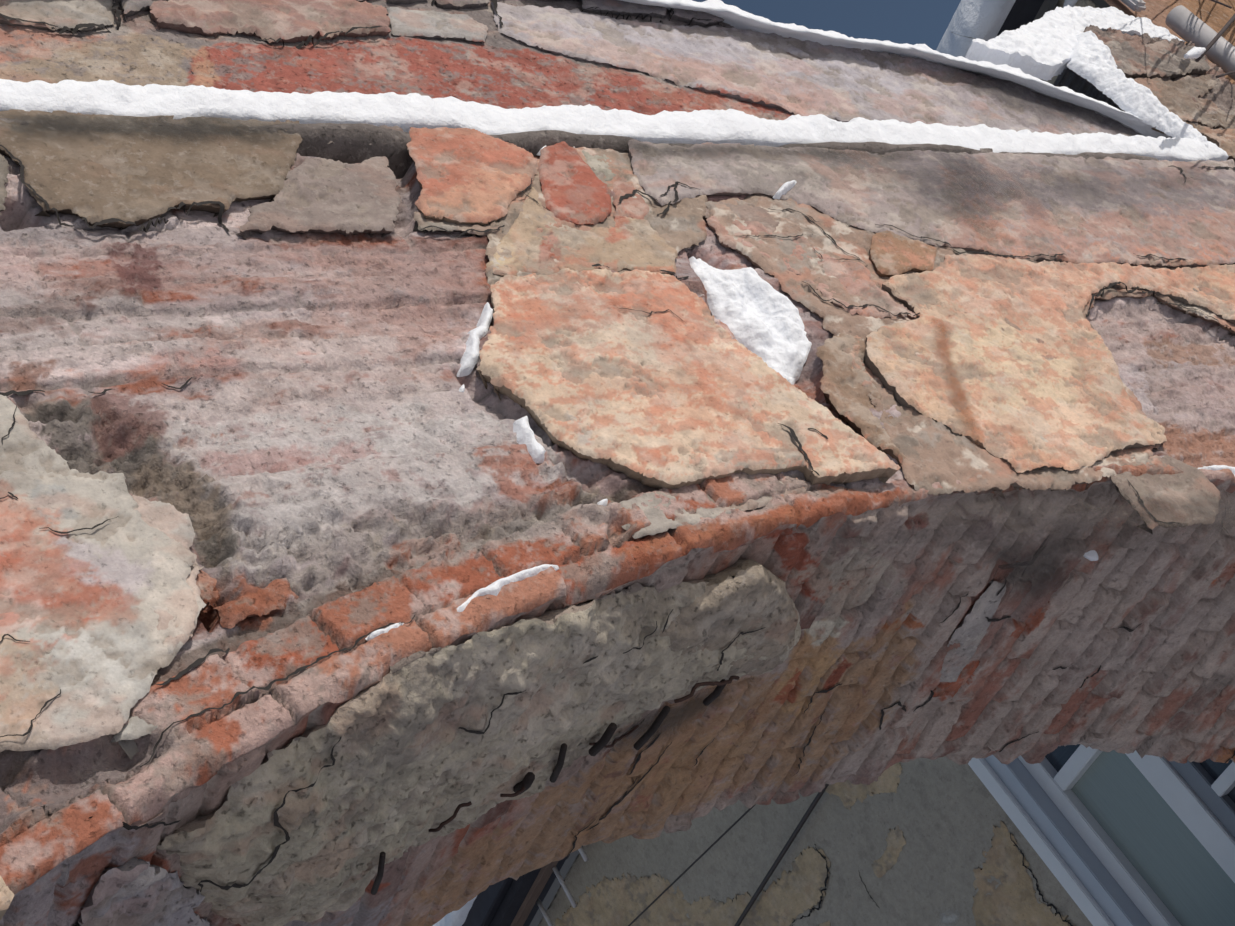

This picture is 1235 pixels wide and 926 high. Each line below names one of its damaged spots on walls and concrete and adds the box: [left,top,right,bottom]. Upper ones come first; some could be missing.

crack [0,0,122,35]
crack [0,145,230,232]
crack [875,224,1063,258]
peeling [0,39,1235,539]
crack [1086,281,1235,347]
crack [0,390,45,445]
crack [39,516,118,534]
crack [0,689,61,737]
crack [140,615,415,767]
crack [198,737,341,892]
peeling [555,846,831,926]
peeling [972,821,1075,926]